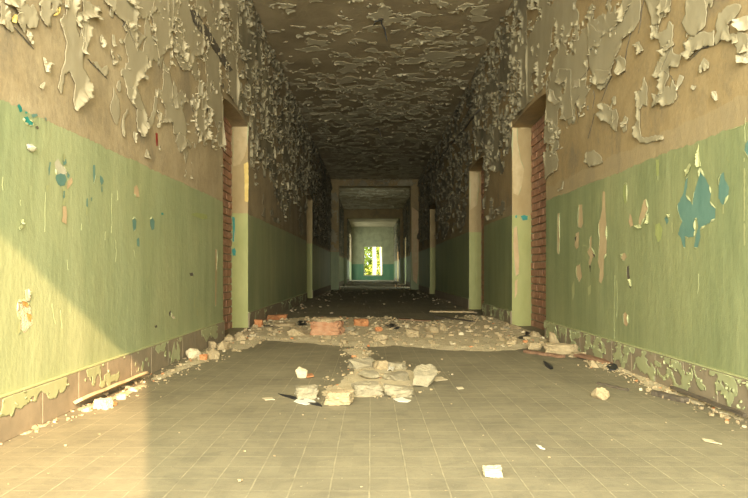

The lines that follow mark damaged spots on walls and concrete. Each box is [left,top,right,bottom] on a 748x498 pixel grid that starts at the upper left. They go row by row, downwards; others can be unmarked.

peeling [0,0,748,300]
peeling [17,289,33,334]
peeling [0,377,69,417]
peeling [85,364,120,388]
peeling [544,322,748,410]